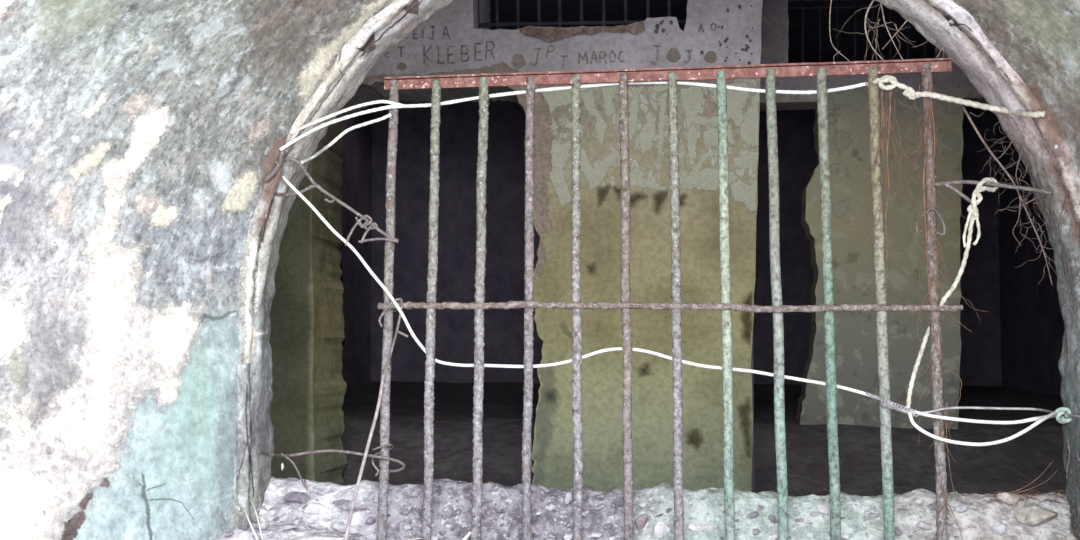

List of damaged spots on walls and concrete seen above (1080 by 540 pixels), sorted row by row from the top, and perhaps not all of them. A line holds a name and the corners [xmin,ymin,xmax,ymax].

flaking render [519,20,673,42]
flaking render [666,48,681,63]
flaking render [700,26,753,65]
flaking render [249,117,270,146]
flaking render [222,170,258,212]
peeling [509,79,760,277]
flaking render [0,91,205,540]
flaking render [242,237,264,364]